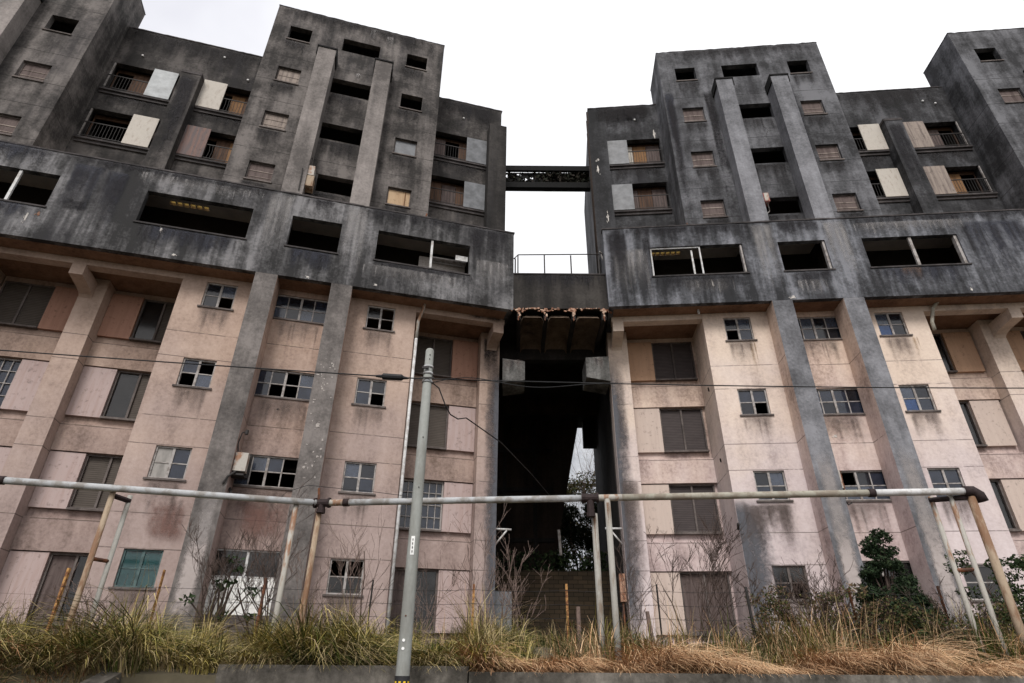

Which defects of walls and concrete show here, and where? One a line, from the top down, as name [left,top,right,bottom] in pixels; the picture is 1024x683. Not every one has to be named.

damp [890,124,961,167]
damp [69,158,265,201]
damp [608,219,742,263]
damp [902,211,1024,249]
spalling [511,307,612,321]
damp [610,374,639,619]
damp [735,504,772,630]